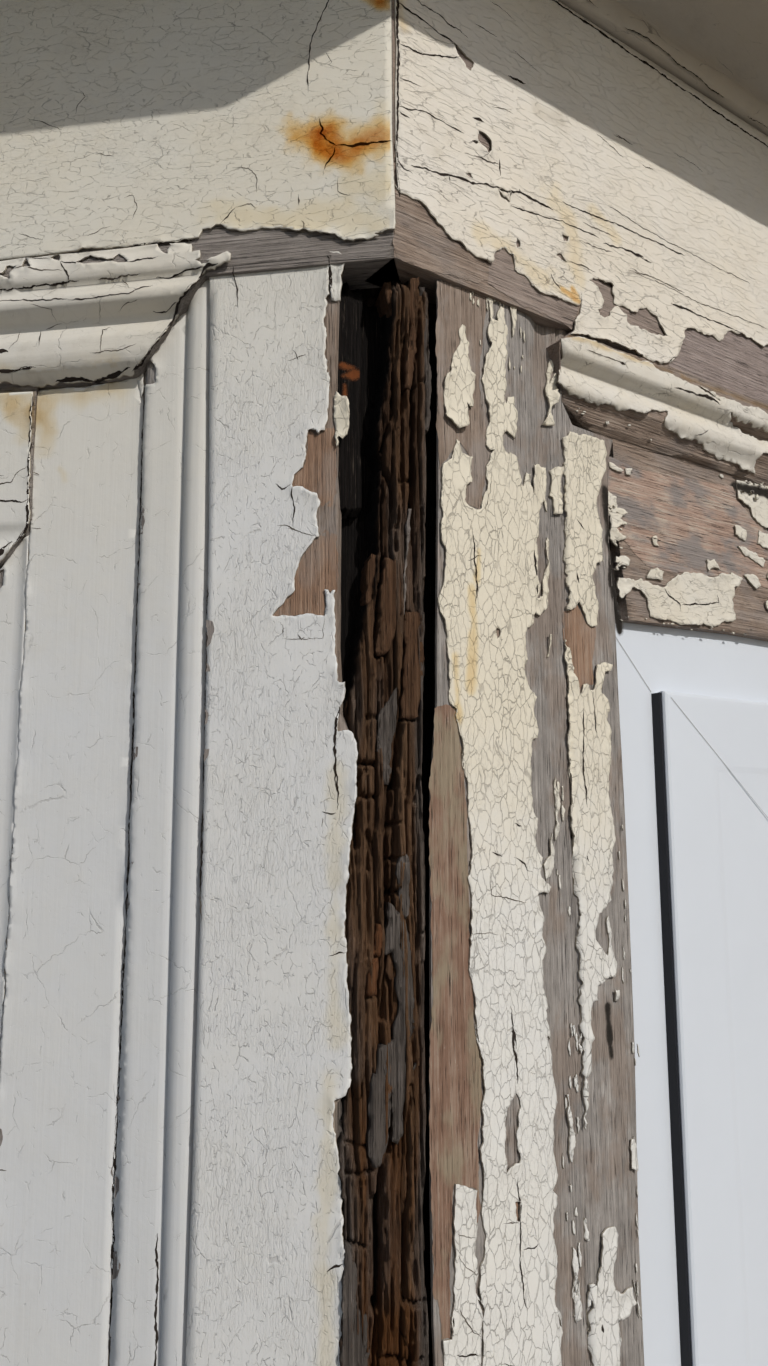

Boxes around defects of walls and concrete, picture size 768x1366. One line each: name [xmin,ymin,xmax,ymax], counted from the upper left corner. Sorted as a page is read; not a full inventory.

crack [307,0,332,86]
crack [319,0,768,332]
peeling [81,255,128,264]
peeling [591,279,665,336]
peeling [159,184,578,616]
crack [675,387,719,435]
peeling [668,329,768,404]
crack [277,484,310,535]
crack [322,707,340,824]
peeling [542,359,768,1366]
peeling [429,704,483,1366]
peeling [505,1094,520,1169]